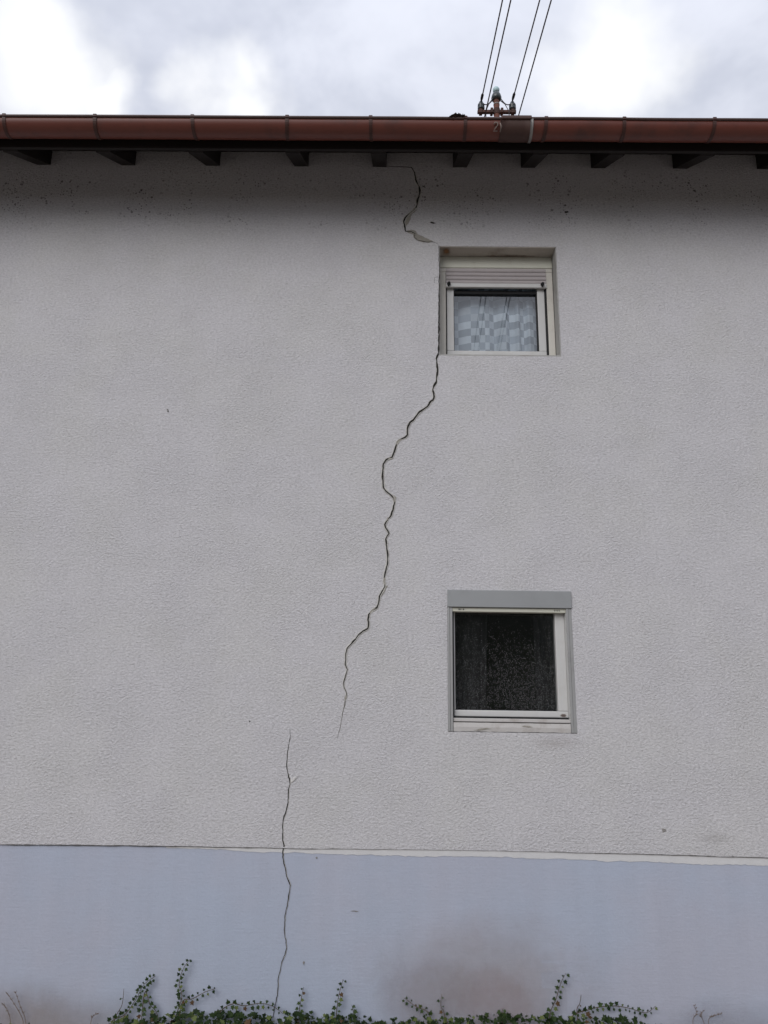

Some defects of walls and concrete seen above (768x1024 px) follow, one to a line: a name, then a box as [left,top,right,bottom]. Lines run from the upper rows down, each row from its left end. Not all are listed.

crack [338,166,440,734]
crack [0,735,297,1018]
crack [646,852,765,860]